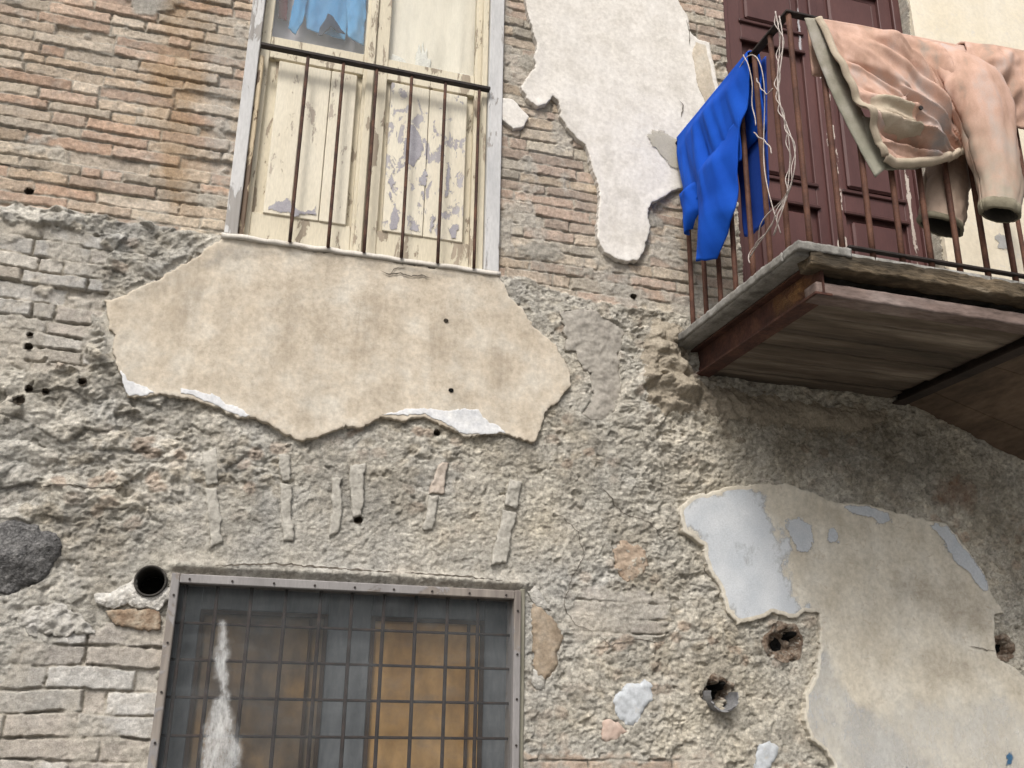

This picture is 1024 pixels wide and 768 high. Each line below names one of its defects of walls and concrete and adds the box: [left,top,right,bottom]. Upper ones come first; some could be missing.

flaking render [502,0,718,264]
flaking render [104,238,571,444]
flaking render [202,448,223,548]
flaking render [678,483,1024,768]